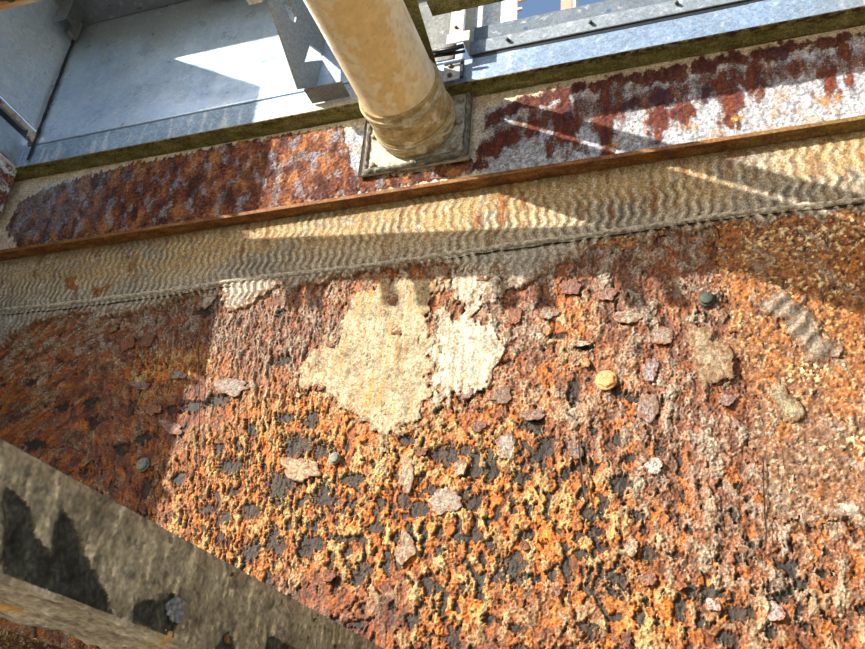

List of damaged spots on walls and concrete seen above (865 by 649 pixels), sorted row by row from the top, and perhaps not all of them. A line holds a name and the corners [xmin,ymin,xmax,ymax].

rust [6,31,865,247]
peeling [296,259,515,483]
rust [0,199,865,649]